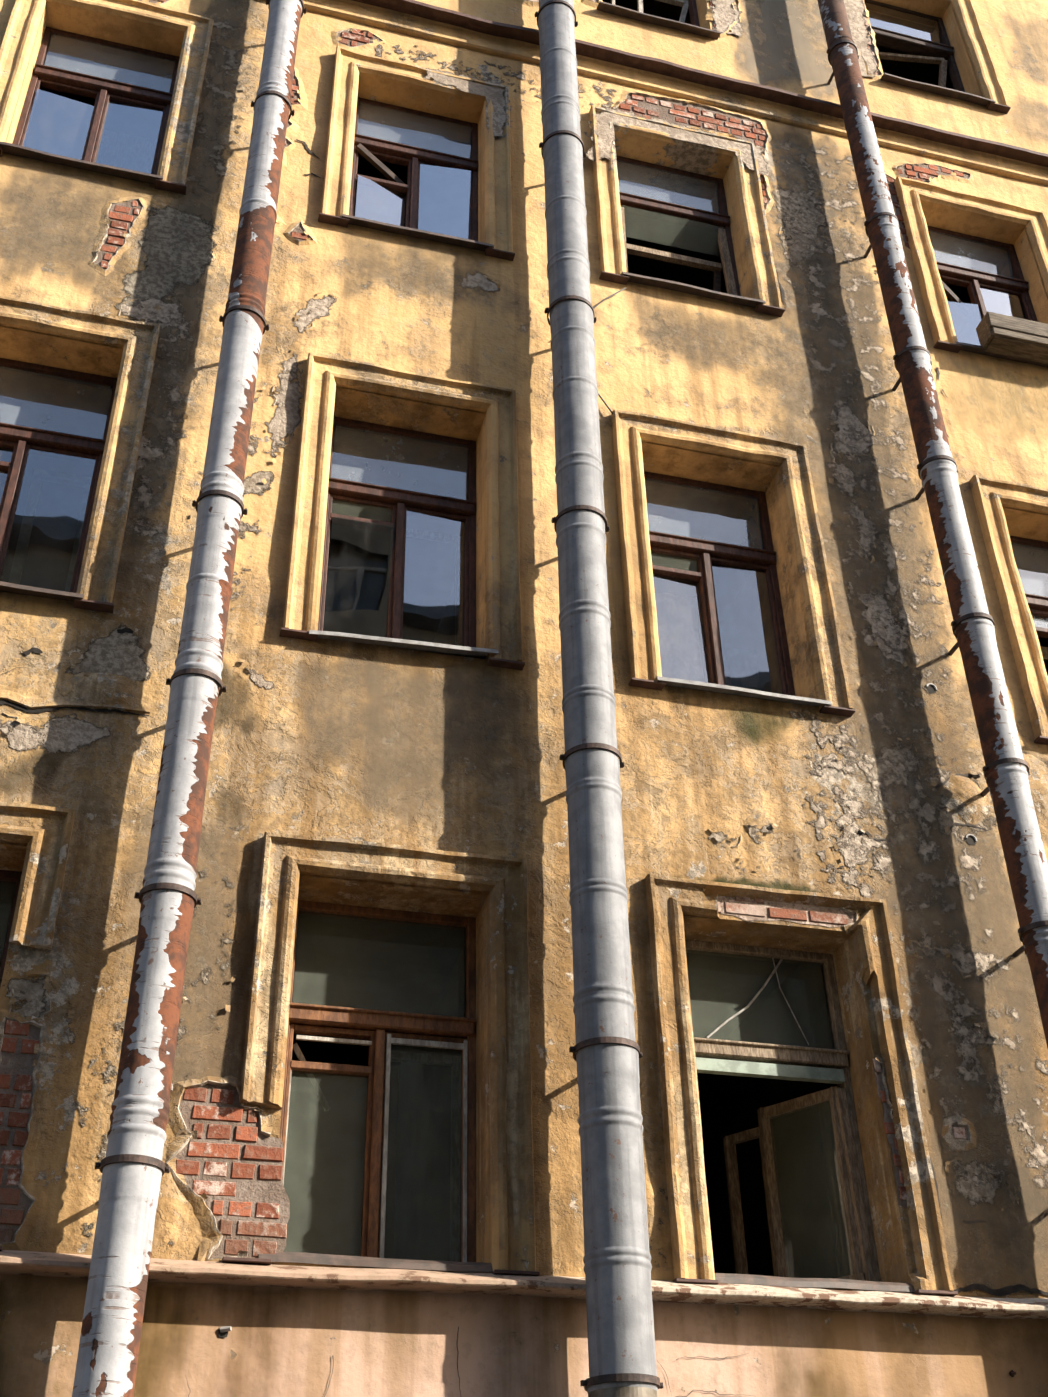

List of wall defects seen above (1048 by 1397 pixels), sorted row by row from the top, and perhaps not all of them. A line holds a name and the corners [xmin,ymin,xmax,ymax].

damp [736,0,837,98]
peeling [65,625,151,682]
peeling [578,85,1048,1218]
peeling [0,712,112,754]
flaking render [0,971,54,1251]
peeling [72,1009,126,1181]
flaking render [165,1073,290,1262]
crack [454,1326,462,1396]
crack [658,1353,752,1397]